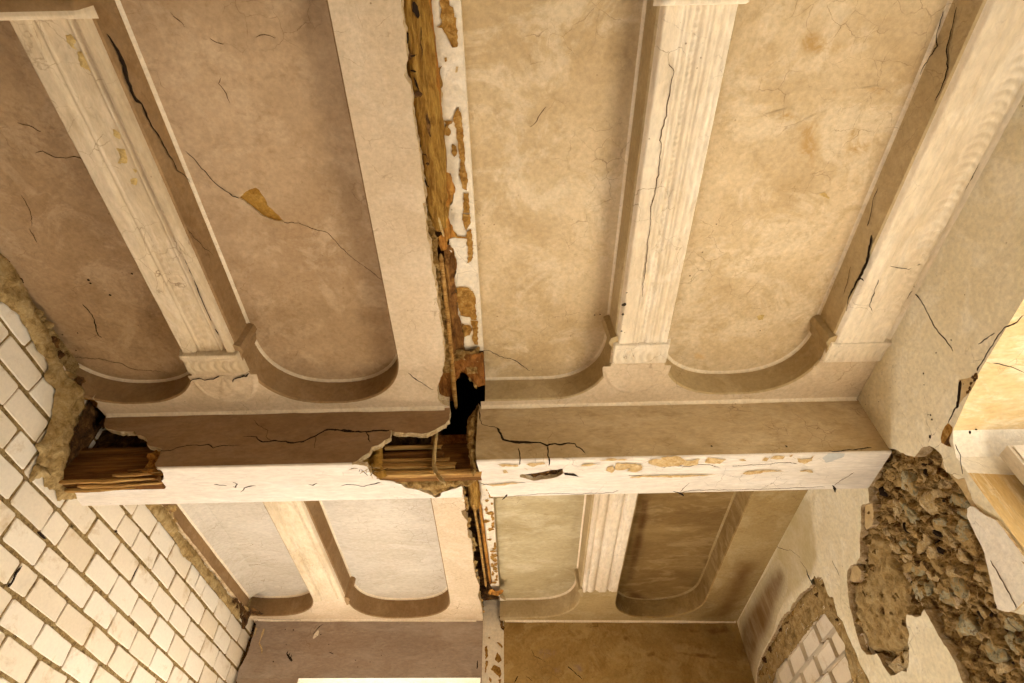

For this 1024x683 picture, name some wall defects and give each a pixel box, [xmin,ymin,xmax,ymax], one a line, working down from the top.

crack [920,7,957,100]
crack [107,34,238,198]
spalling [239,188,284,222]
crack [642,65,674,295]
spalling [45,375,164,485]
peeling [349,0,726,615]
crack [478,406,871,500]
peeling [740,453,845,475]
crack [844,189,953,351]
spalling [956,373,978,409]
crack [977,315,1023,372]
spalling [757,423,1024,683]